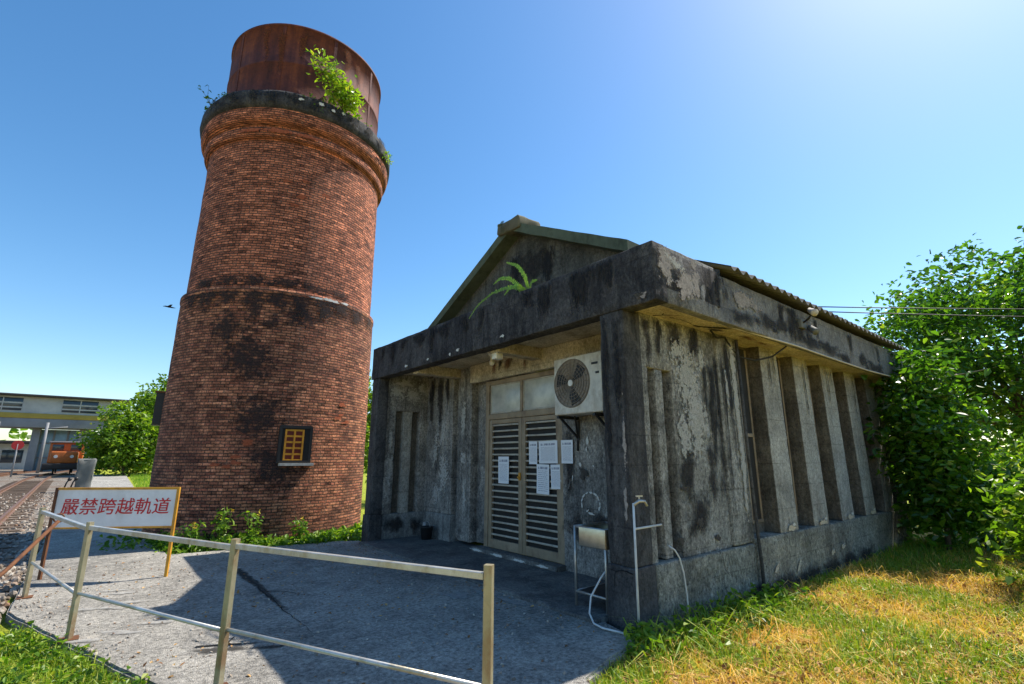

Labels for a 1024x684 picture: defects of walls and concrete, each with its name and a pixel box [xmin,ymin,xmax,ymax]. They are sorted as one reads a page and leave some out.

damp [510,246,554,314]
damp [381,309,483,361]
damp [702,266,883,374]
damp [185,274,371,492]
damp [429,378,449,430]
damp [643,319,727,534]
crack [237,568,314,634]